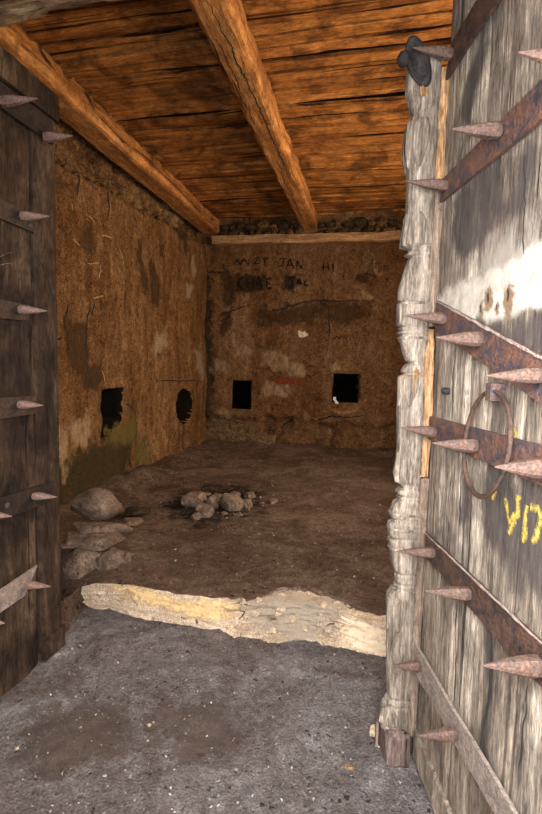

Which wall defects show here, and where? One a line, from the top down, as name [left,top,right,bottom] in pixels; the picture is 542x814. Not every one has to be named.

crack [220,299,365,341]
leakage [59,435,132,498]